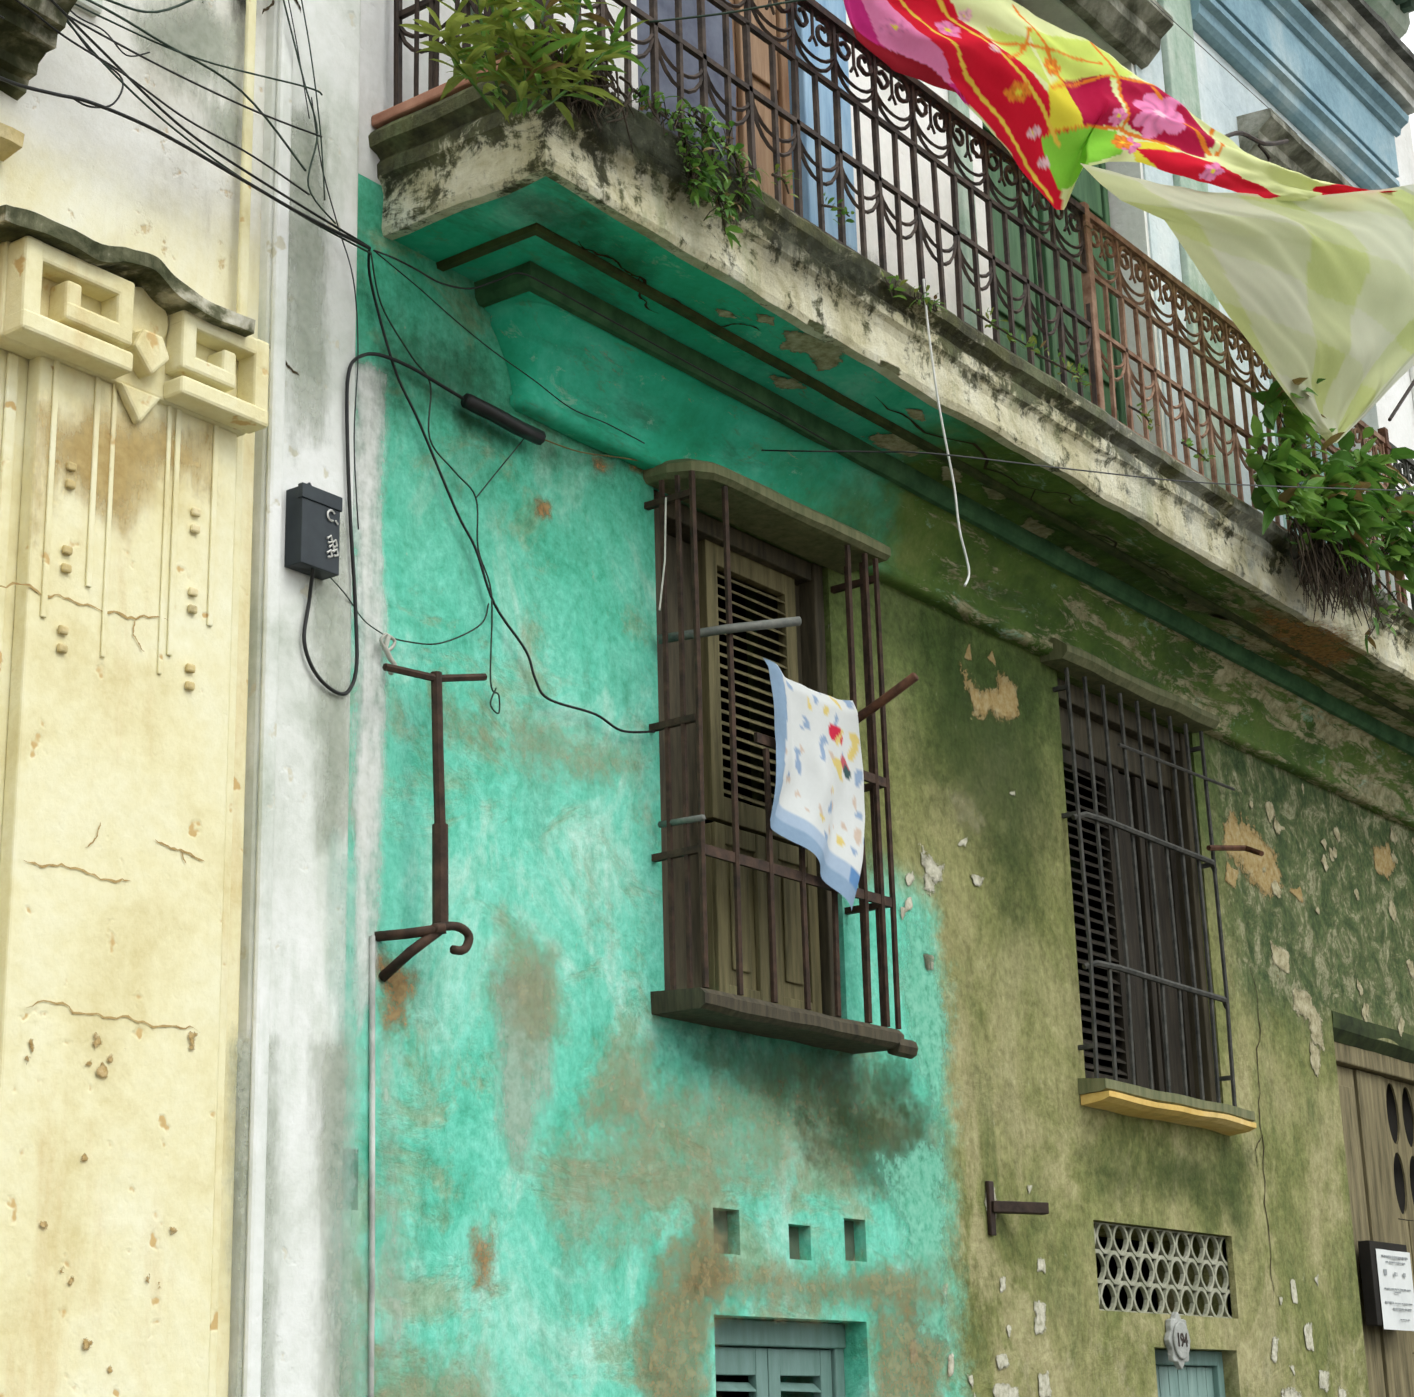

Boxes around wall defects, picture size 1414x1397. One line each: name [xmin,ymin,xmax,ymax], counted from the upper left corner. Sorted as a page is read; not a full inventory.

peeling [756,313,844,371]
peeling [878,360,901,376]
spalling [960,644,1020,724]
spalling [1222,800,1320,914]
peeling [1321,826,1341,872]
crack [26,1000,198,1031]
peeling [1270,940,1326,1077]
peeling [1357,978,1369,1022]
flaking render [638,1219,976,1397]
peeling [1034,1300,1047,1334]
peeling [993,1354,1019,1397]
peeling [1038,1370,1052,1397]